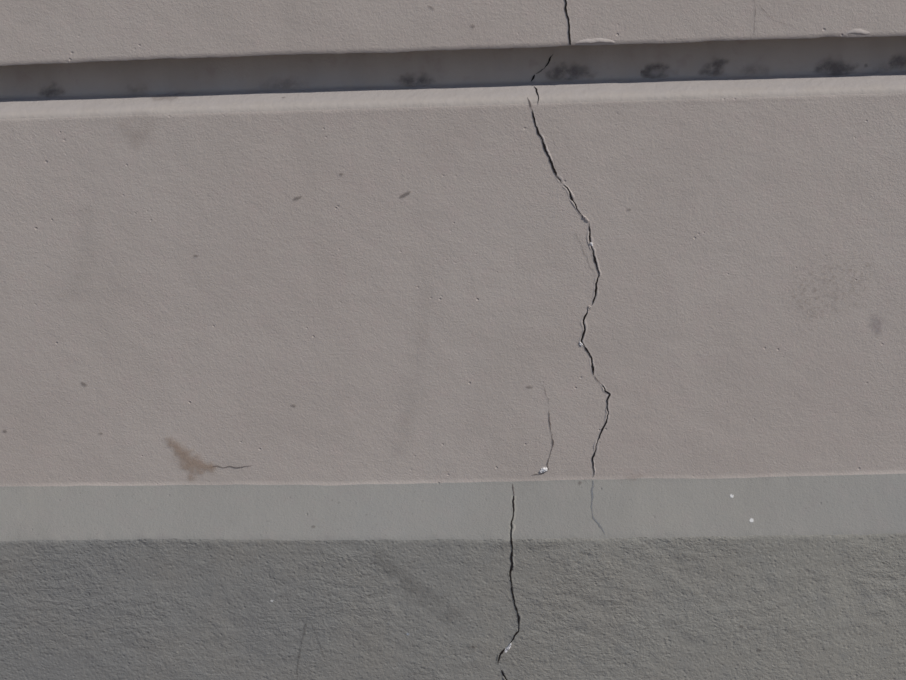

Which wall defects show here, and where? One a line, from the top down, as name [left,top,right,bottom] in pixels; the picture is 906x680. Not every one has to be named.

crack [527,0,612,534]
crack [496,483,522,680]